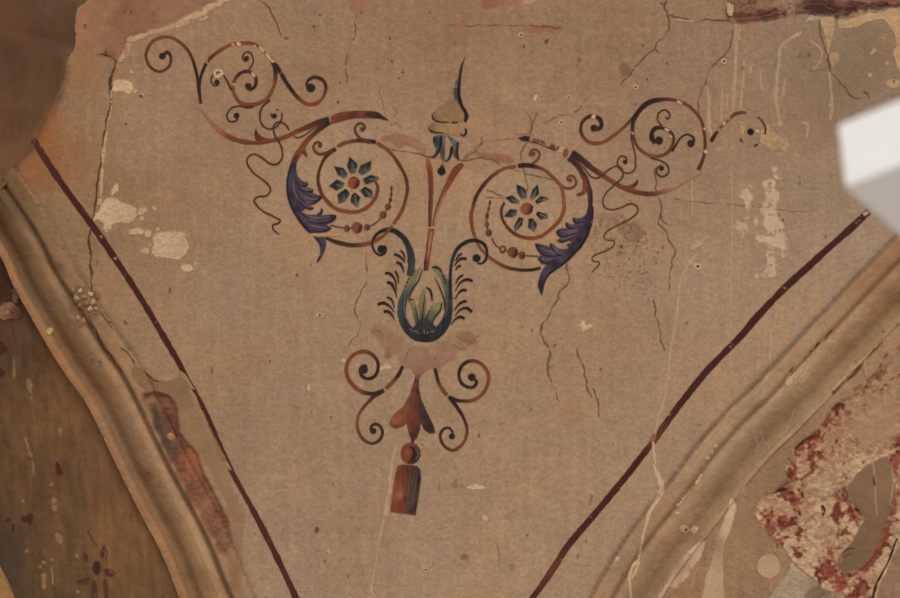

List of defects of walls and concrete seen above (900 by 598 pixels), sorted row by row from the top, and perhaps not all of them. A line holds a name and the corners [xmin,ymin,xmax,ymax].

crack [622,1,731,82]
flaking render [727,0,900,91]
crack [819,26,869,99]
crack [88,53,116,290]
flaking render [93,176,197,272]
crack [540,264,570,380]
flaking render [755,340,900,598]